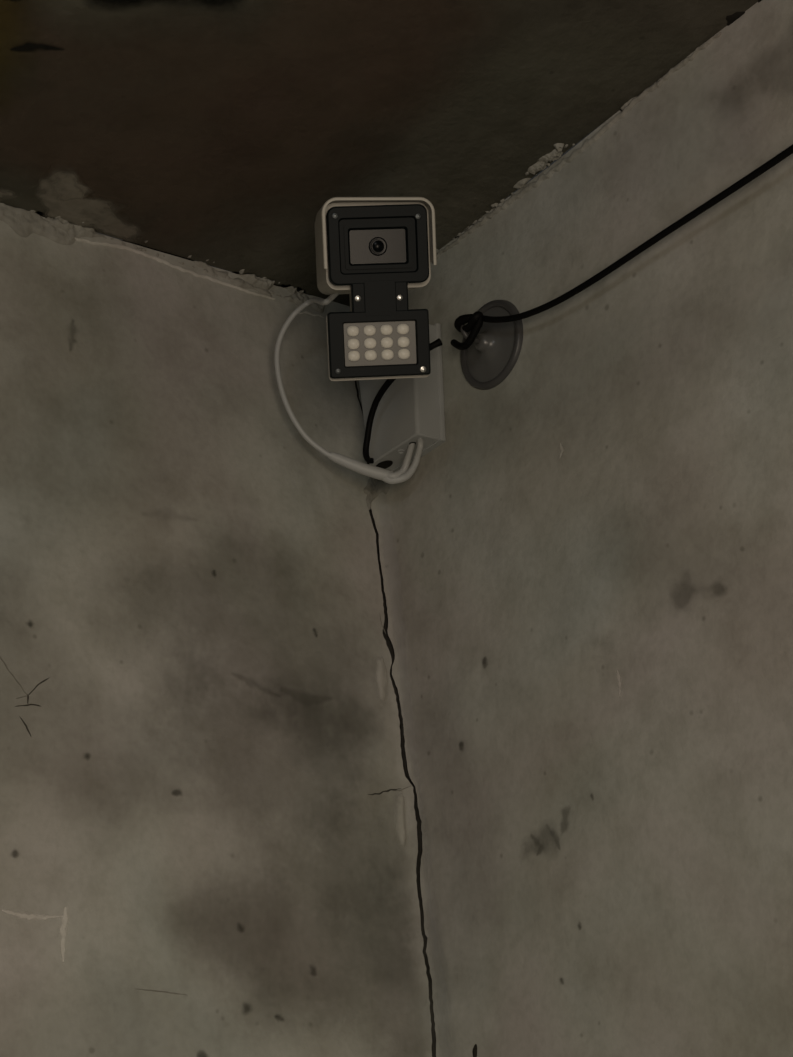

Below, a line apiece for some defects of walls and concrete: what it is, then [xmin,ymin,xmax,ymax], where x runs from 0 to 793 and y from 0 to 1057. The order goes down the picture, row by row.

peeling [0,191,324,318]
crack [354,380,365,426]
crack [368,509,436,1057]